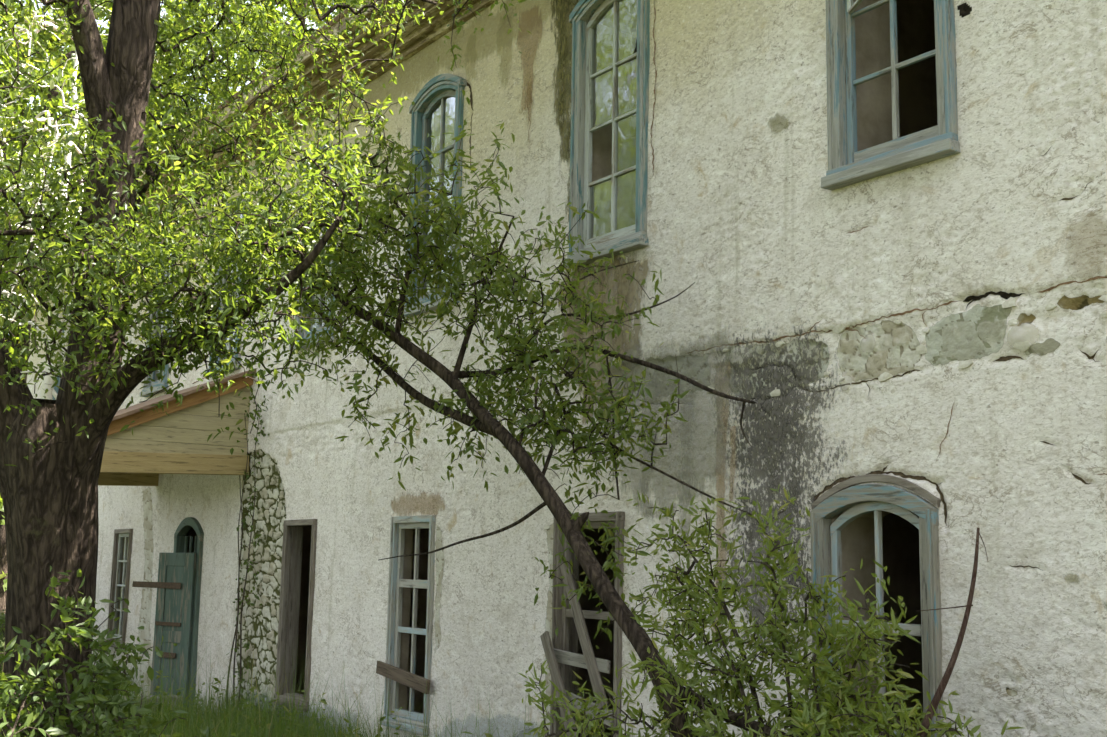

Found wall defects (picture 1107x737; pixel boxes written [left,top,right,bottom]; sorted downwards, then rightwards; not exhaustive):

damp [552,0,571,163]
spalling [622,294,1107,398]
crack [686,276,1107,413]
damp [711,327,847,657]